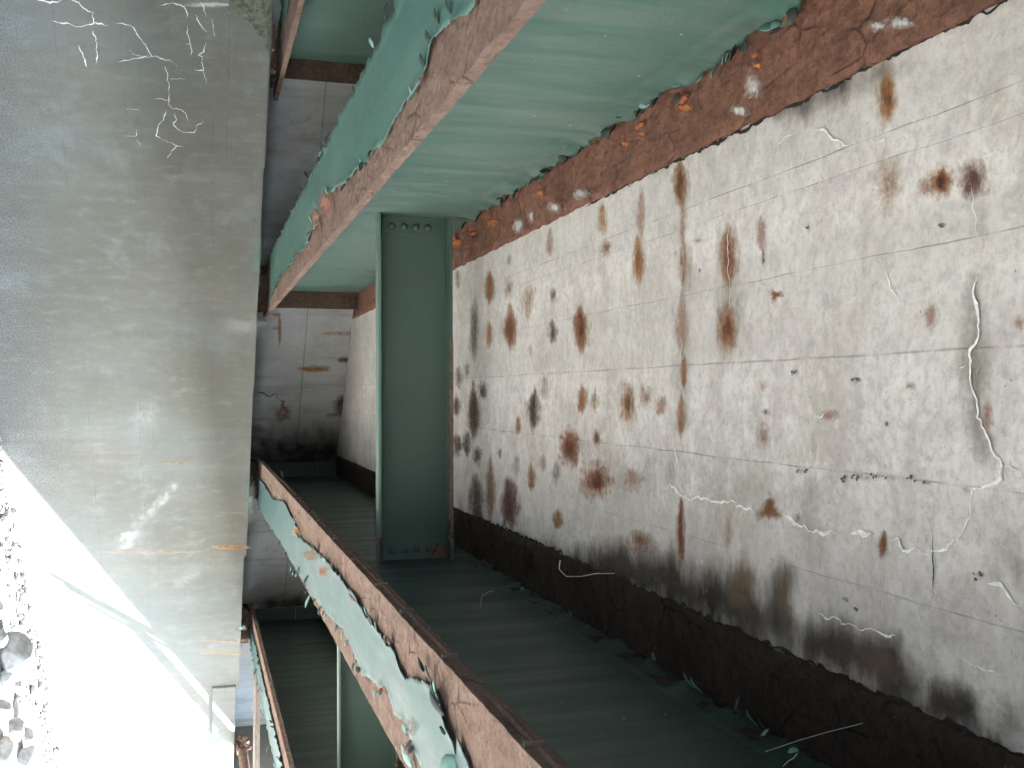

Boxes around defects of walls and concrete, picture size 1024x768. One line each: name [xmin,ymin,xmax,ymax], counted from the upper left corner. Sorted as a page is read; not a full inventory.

crack [38,0,215,151]
peeling [270,0,476,297]
peeling [453,0,820,229]
crack [585,0,1008,208]
rust [921,166,982,195]
rust [487,305,516,347]
rust [573,308,586,352]
rust [560,432,613,494]
crack [783,281,1018,606]
peeling [257,477,470,768]
water stain [574,545,915,698]
water stain [929,687,977,727]